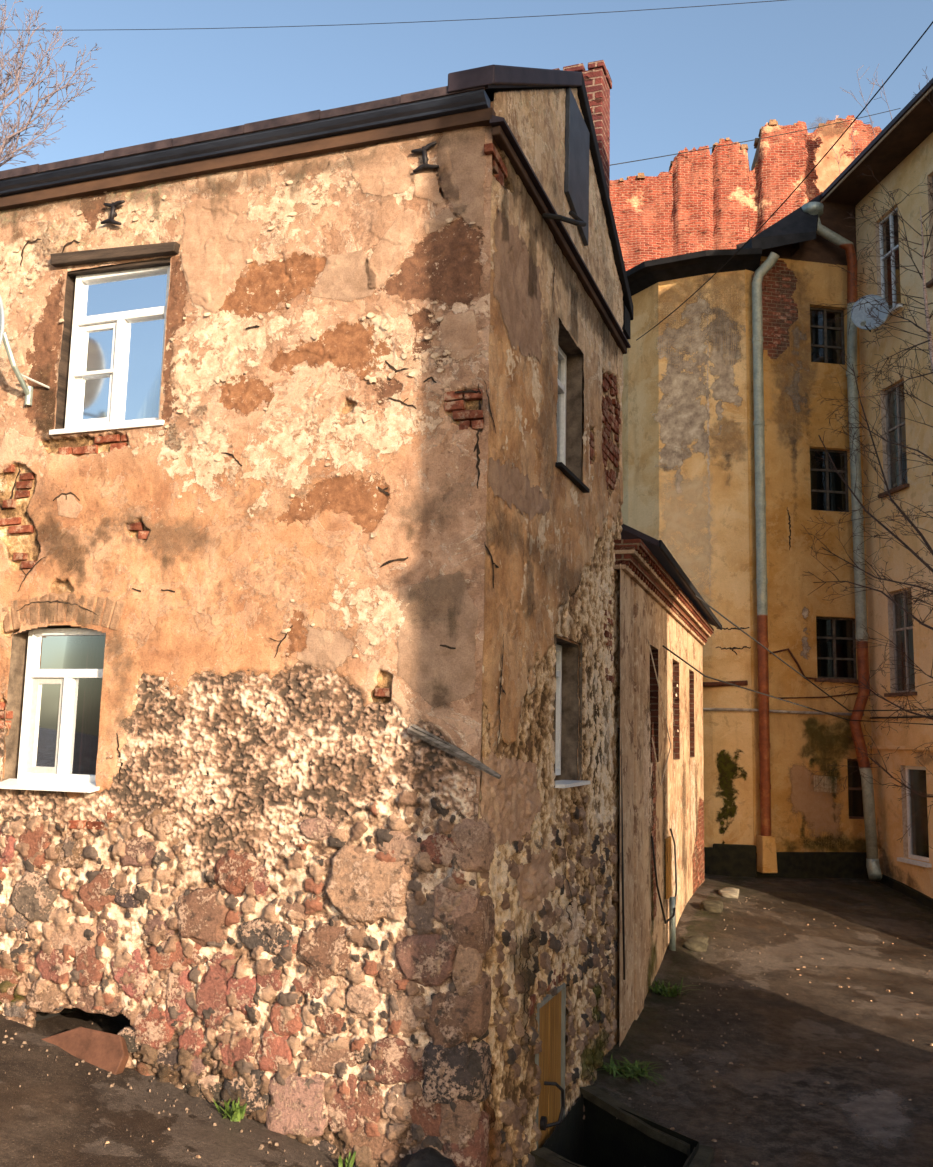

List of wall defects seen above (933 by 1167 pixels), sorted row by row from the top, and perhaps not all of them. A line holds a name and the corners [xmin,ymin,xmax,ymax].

flaking render [0,190,181,457]
peeling [152,151,485,538]
flaking render [652,293,745,582]
spalling [752,260,809,412]
spalling [0,371,699,1167]
spalling [672,758,705,901]
leakage [802,718,853,821]